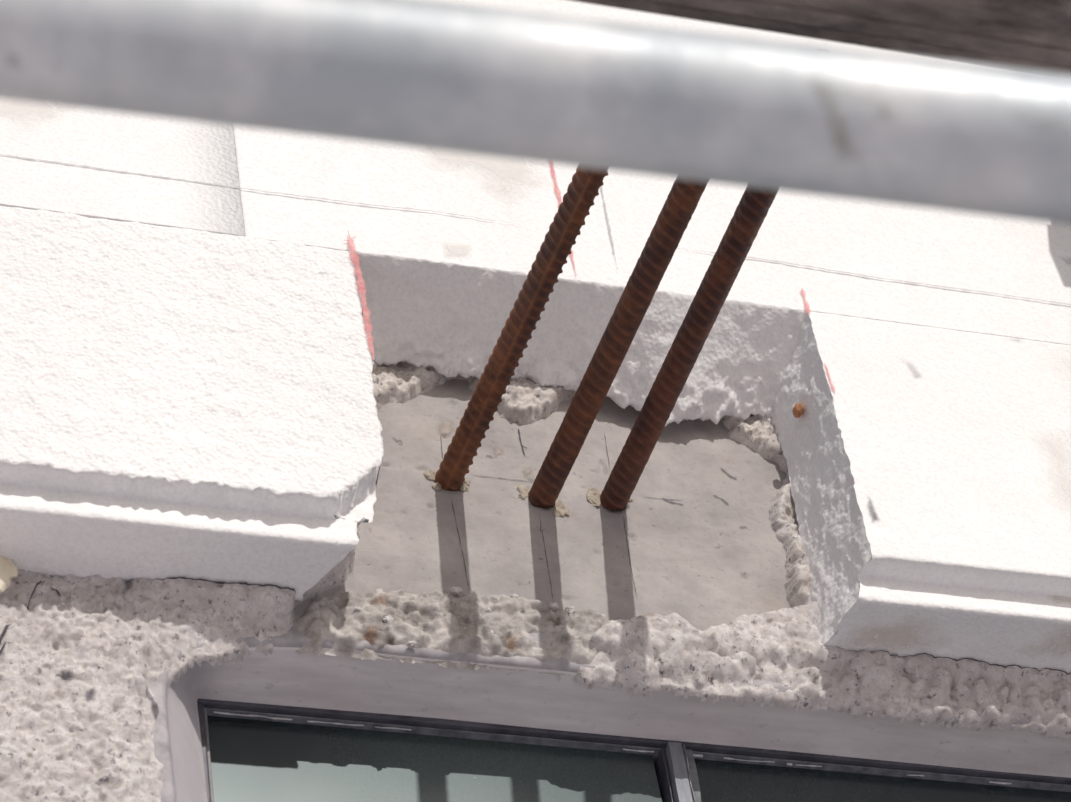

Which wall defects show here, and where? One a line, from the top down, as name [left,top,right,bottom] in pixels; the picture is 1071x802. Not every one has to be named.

spalling [372,167,708,508]
spalling [600,187,778,510]
spalling [294,587,606,676]
spalling [720,414,812,608]